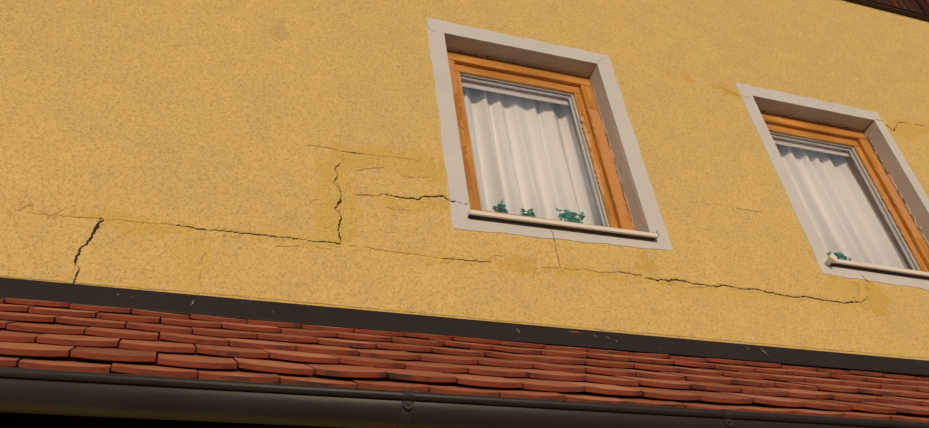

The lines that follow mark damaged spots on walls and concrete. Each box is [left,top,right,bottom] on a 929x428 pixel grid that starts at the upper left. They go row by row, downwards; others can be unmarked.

crack [0,145,925,358]